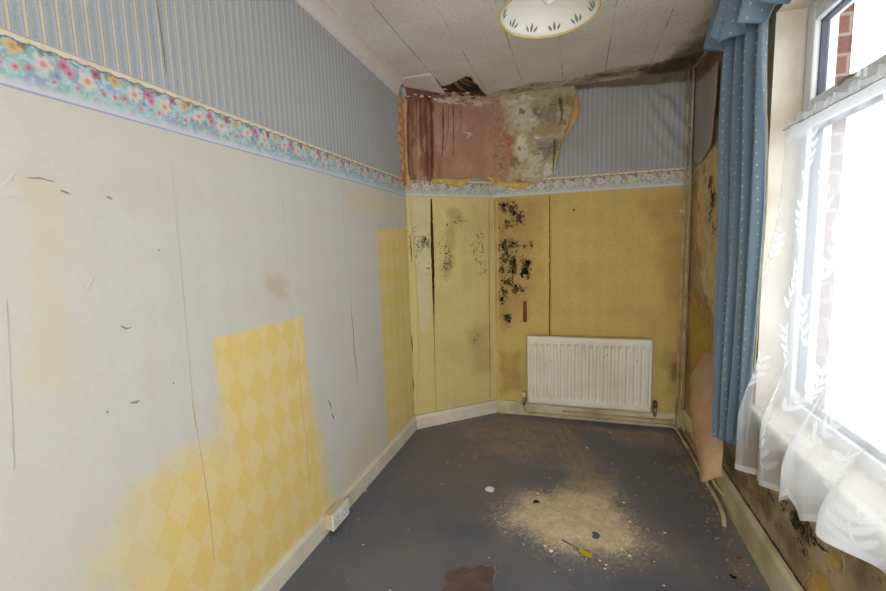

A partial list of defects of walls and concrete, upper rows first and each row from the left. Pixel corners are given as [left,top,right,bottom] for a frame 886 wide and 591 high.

leakage [575,21,723,90]
flaking render [397,77,578,188]
mould [702,165,717,236]
leakage [48,182,551,591]
leakage [781,500,827,560]